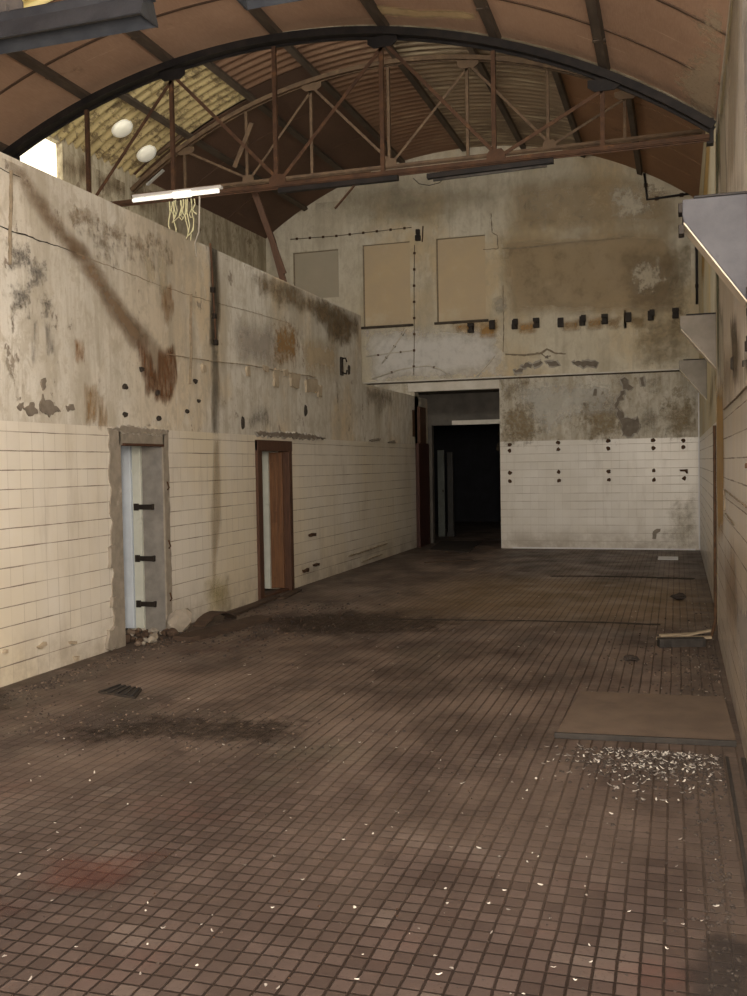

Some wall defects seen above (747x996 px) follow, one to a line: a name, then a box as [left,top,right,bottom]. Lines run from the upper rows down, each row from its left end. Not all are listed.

crack [0,168,316,384]
peeling [17,378,75,417]
corrosion [138,342,177,402]
flaking render [613,375,646,438]